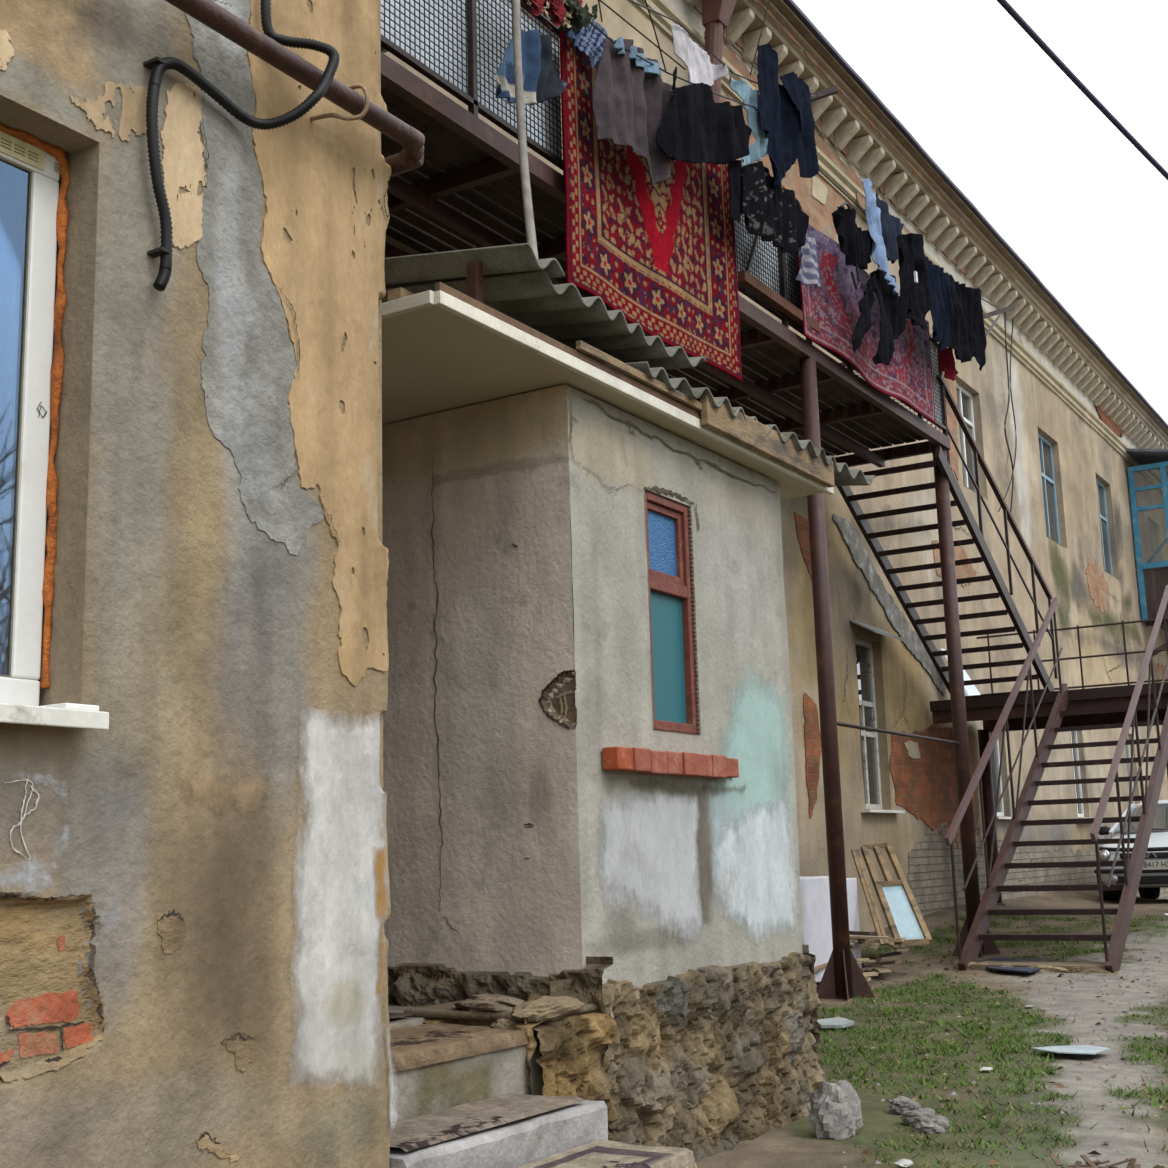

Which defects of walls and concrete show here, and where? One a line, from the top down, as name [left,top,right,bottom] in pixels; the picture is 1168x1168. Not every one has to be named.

peeling [0,29,14,71]
flaking render [249,0,388,112]
flaking render [69,81,207,249]
flaking render [247,51,391,686]
crack [431,459,459,933]
flaking render [889,724,965,916]
flaking render [972,794,1003,902]
flaking render [1001,846,1097,899]
spalling [0,892,104,1082]